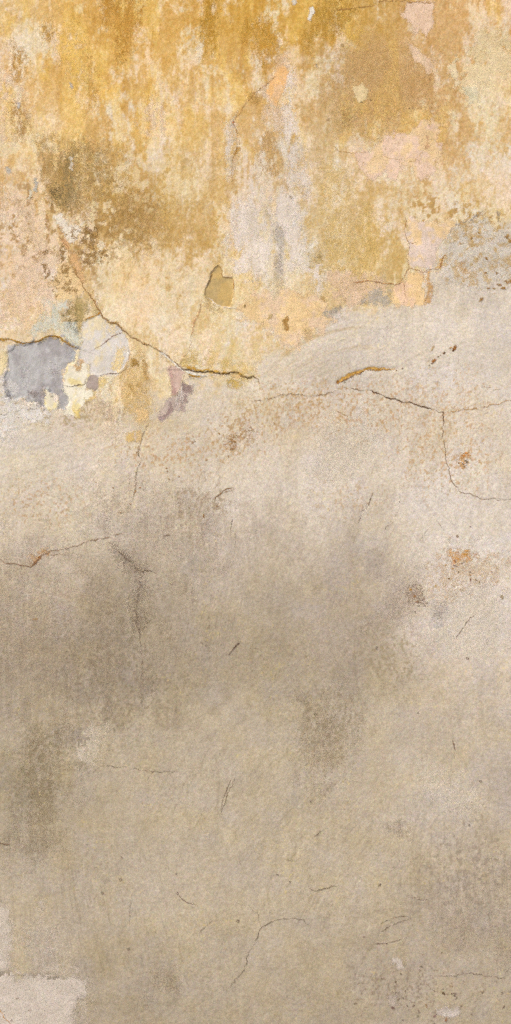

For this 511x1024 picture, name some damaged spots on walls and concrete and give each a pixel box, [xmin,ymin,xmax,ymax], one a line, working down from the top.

water stain [7,37,31,83]
water stain [38,19,106,119]
water stain [100,0,146,65]
water stain [198,0,220,60]
water stain [299,0,456,150]
spalling [0,179,130,419]
water stain [4,98,179,347]
spalling [124,365,194,443]
crack [55,232,509,501]
water stain [216,14,397,316]
crack [0,534,157,705]
water stain [0,460,251,878]